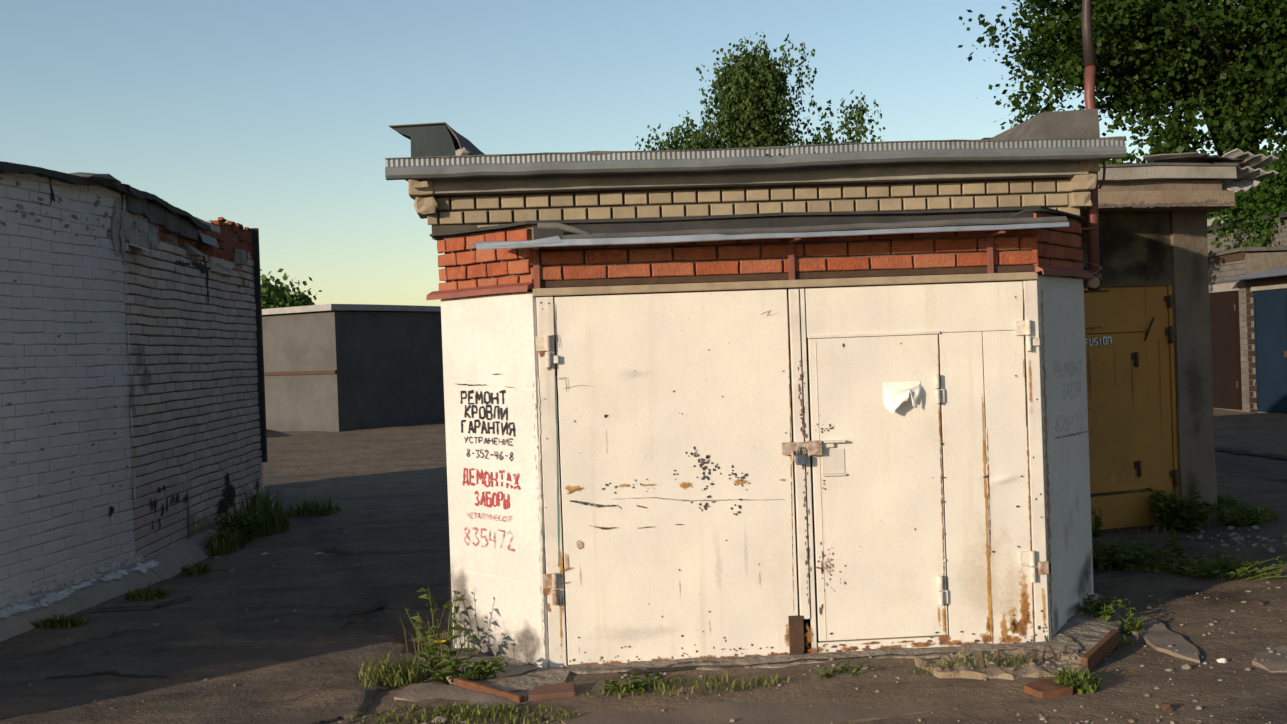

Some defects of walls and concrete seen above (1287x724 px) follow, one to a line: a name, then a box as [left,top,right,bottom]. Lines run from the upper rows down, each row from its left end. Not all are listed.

spalling [154,217,254,297]
corrosion [543,540,583,646]
peeling [686,446,750,515]
corrosion [699,301,794,658]
corrosion [937,337,945,588]
corrosion [842,400,1046,652]